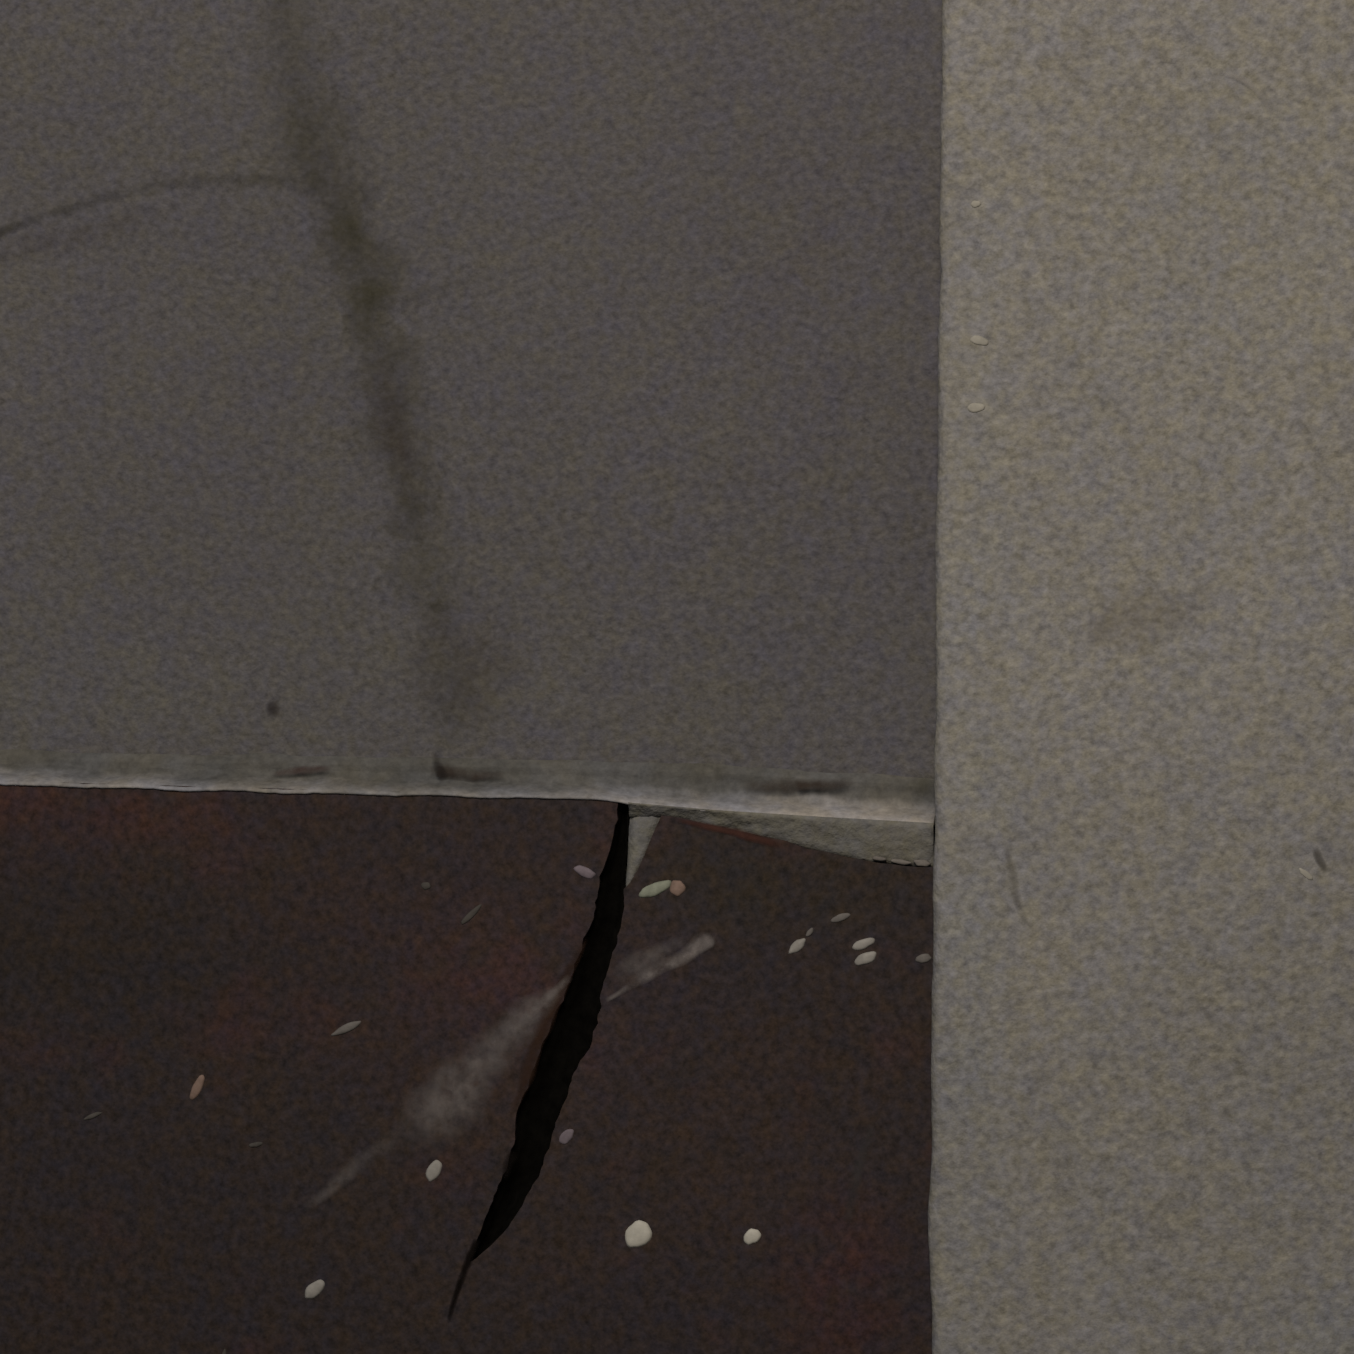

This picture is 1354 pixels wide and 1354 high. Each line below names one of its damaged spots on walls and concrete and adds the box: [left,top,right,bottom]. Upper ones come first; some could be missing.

crack [449,803,630,1315]